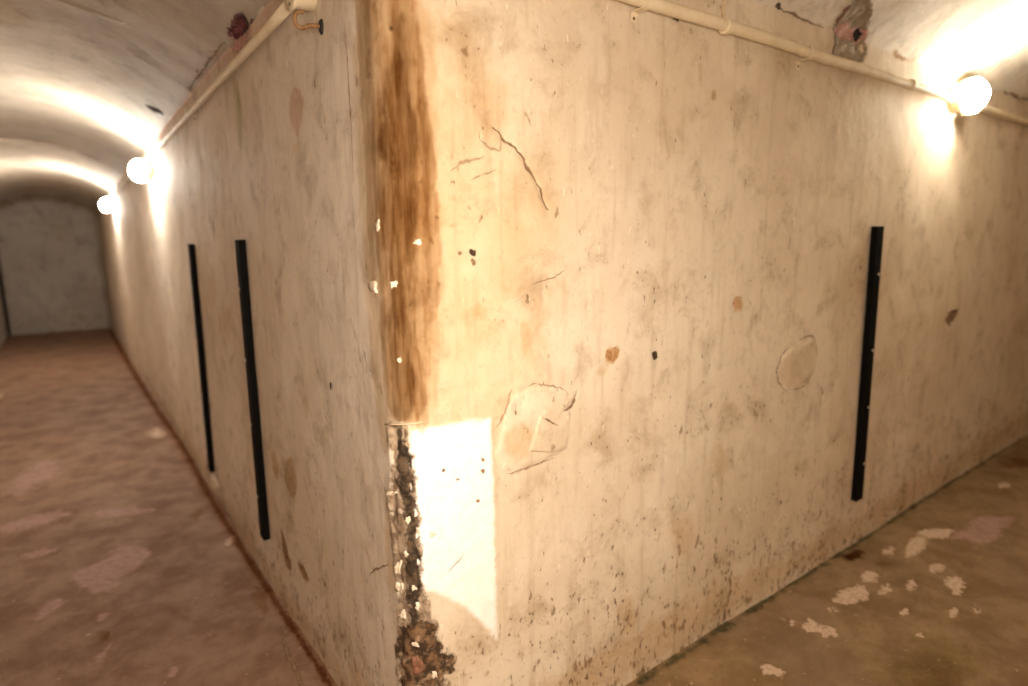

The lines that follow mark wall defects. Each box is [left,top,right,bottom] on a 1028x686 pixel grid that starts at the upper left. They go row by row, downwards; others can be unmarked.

spalling [227,14,254,52]
spalling [832,0,873,63]
crack [452,127,548,210]
spalling [385,425,456,686]